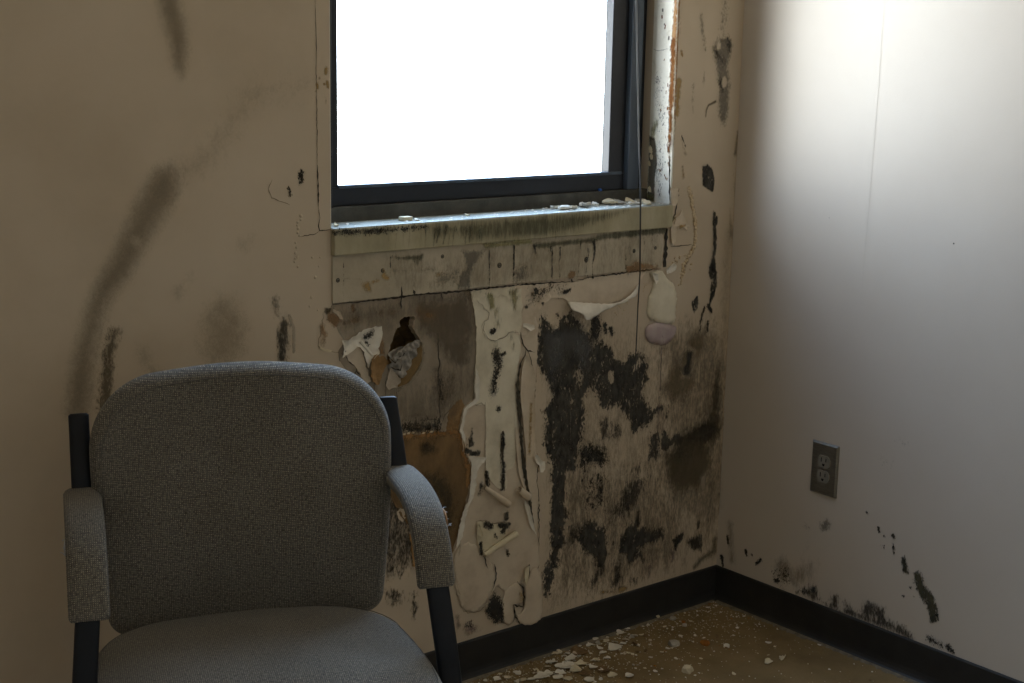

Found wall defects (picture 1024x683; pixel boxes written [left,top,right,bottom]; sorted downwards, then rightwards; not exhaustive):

corrosion [668,0,686,166]
leakage [705,39,732,121]
leakage [98,329,118,407]
leakage [272,299,295,361]
peeling [318,271,647,624]
leakage [533,212,730,596]
leakage [771,568,912,639]
leakage [877,526,939,623]